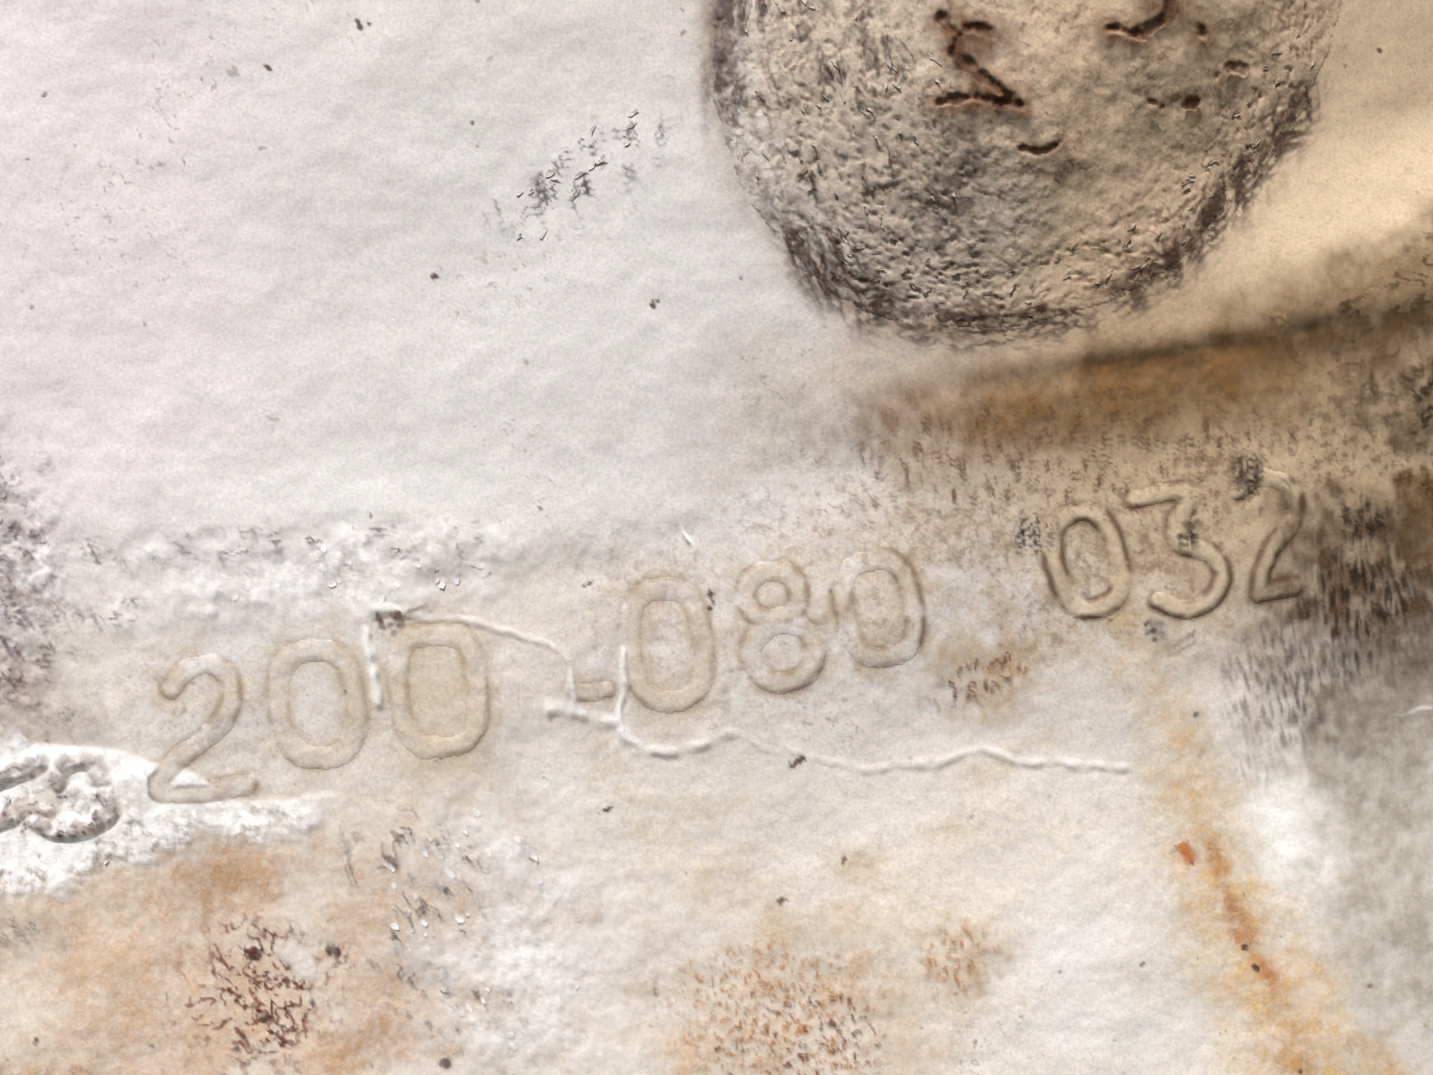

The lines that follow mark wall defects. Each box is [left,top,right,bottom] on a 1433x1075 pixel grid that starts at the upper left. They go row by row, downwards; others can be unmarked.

water stain [899,235,1433,504]
crack [363,603,420,703]
crack [545,646,731,753]
crack [989,748,1125,766]
water stain [1245,467,1433,764]
corrosion [59,842,361,1075]
corrosion [350,907,461,1068]
corrosion [678,948,879,1075]
corrosion [1178,827,1320,1034]